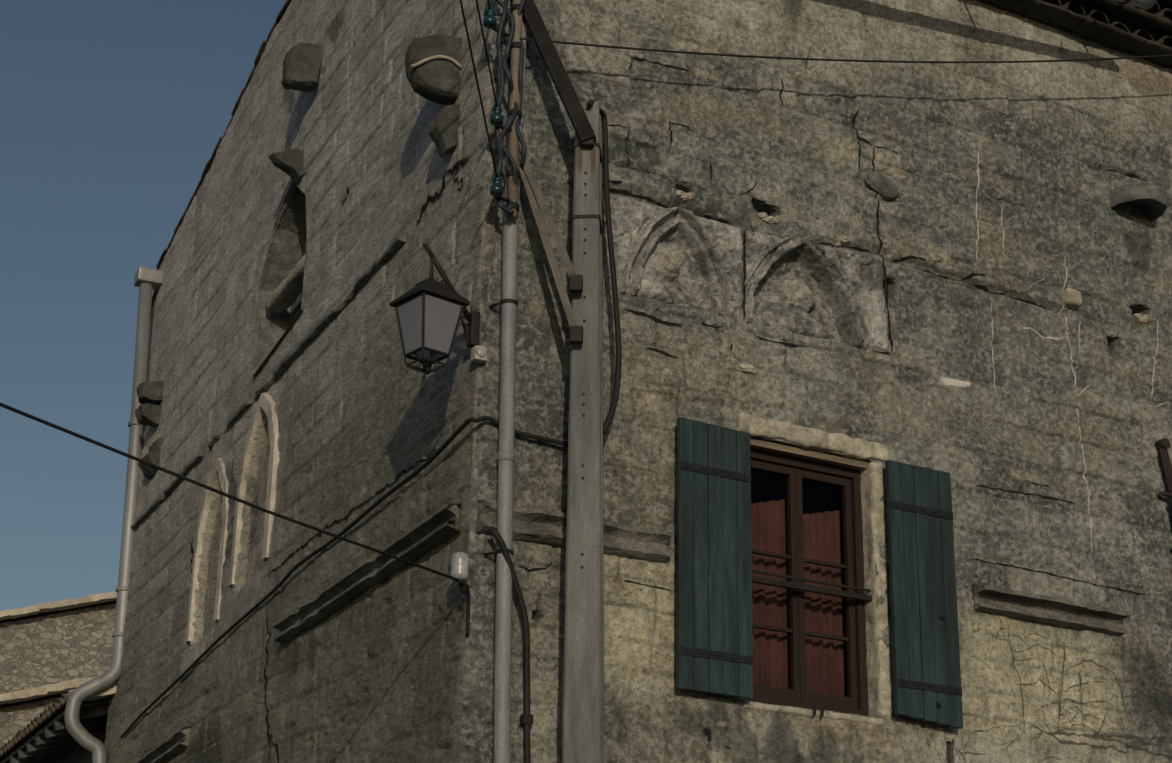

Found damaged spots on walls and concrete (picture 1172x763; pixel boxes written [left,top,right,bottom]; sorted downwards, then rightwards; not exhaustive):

crack [815,109,1048,355]
crack [264,616,279,763]